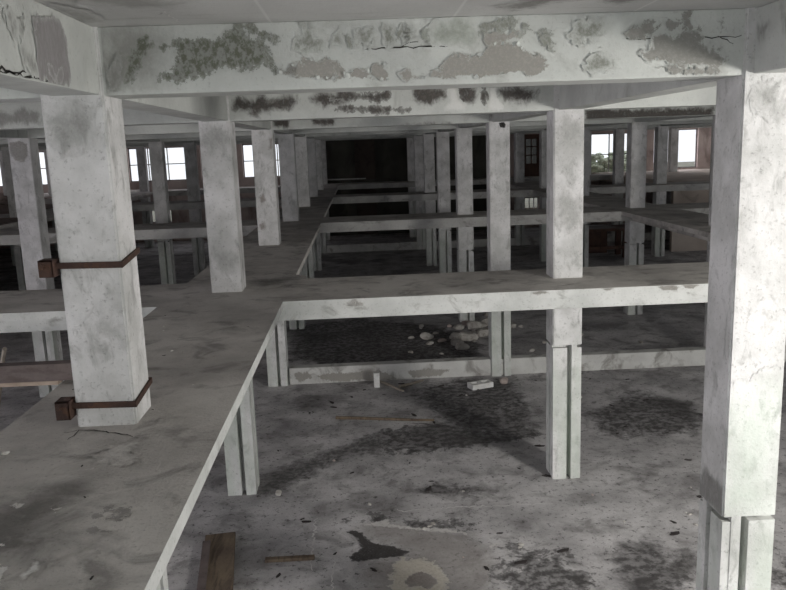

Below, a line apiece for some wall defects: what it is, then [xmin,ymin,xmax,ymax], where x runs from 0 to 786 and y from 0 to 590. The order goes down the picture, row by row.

crack [0,65,48,82]
damp [2,0,281,95]
peeling [279,30,549,83]
damp [291,0,617,78]
peeling [623,10,730,76]
damp [229,86,541,130]
damp [199,122,231,158]
damp [286,318,488,365]
damp [252,373,546,502]
damp [581,388,703,445]